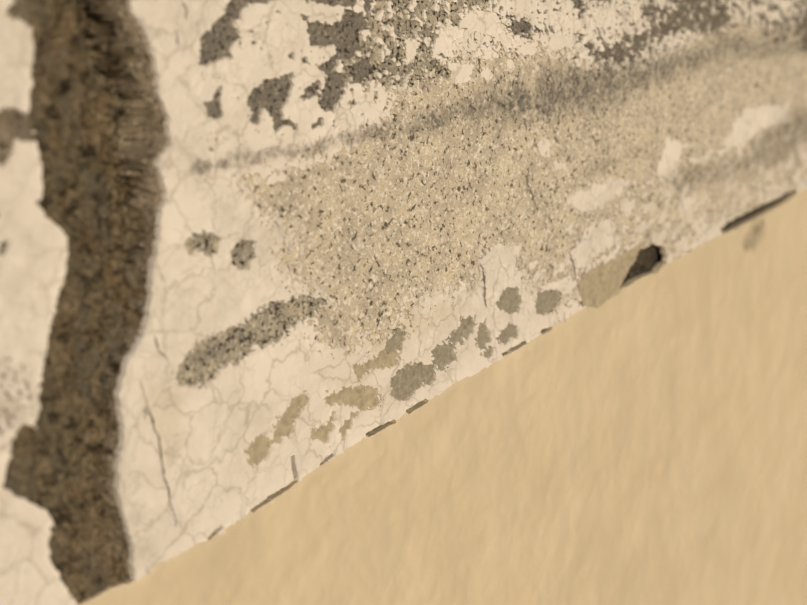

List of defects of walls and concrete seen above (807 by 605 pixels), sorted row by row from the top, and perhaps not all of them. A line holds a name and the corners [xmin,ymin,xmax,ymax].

crack [3,0,169,604]
crack [141,382,177,527]
peeling [244,391,309,467]
peeling [171,0,807,443]